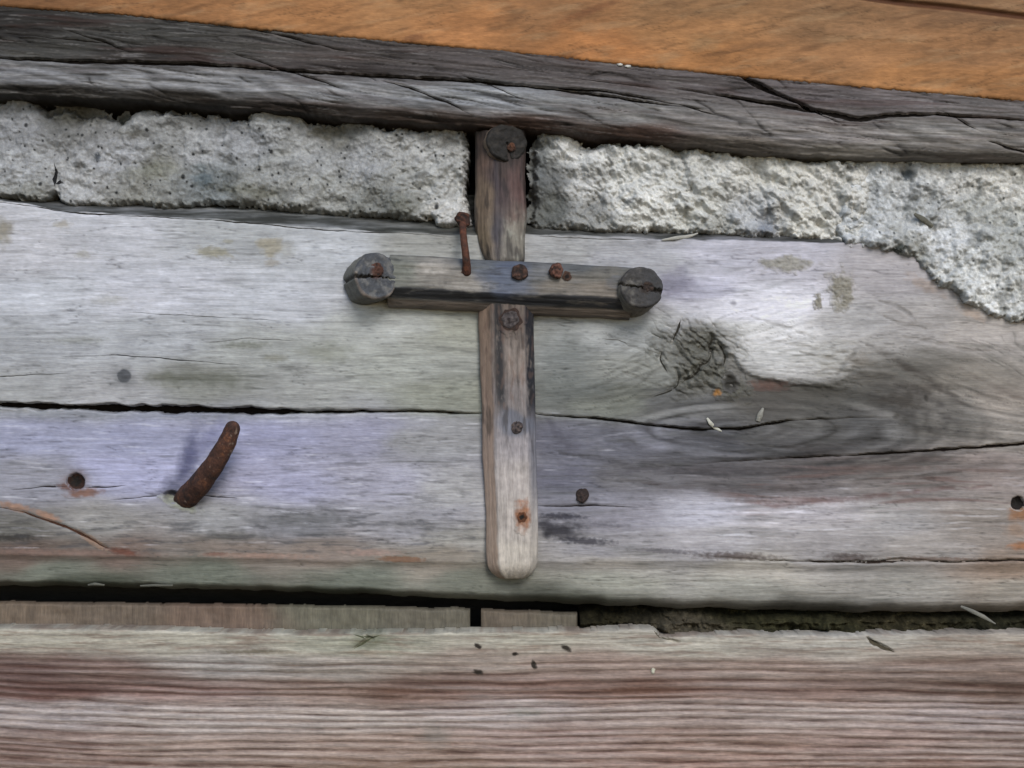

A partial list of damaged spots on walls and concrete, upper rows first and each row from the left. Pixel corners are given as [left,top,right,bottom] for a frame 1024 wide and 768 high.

crack [0,30,1024,153]
crack [656,320,726,396]
crack [0,402,478,415]
crack [538,414,873,431]
crack [701,442,1024,464]
corrosion [511,496,531,536]